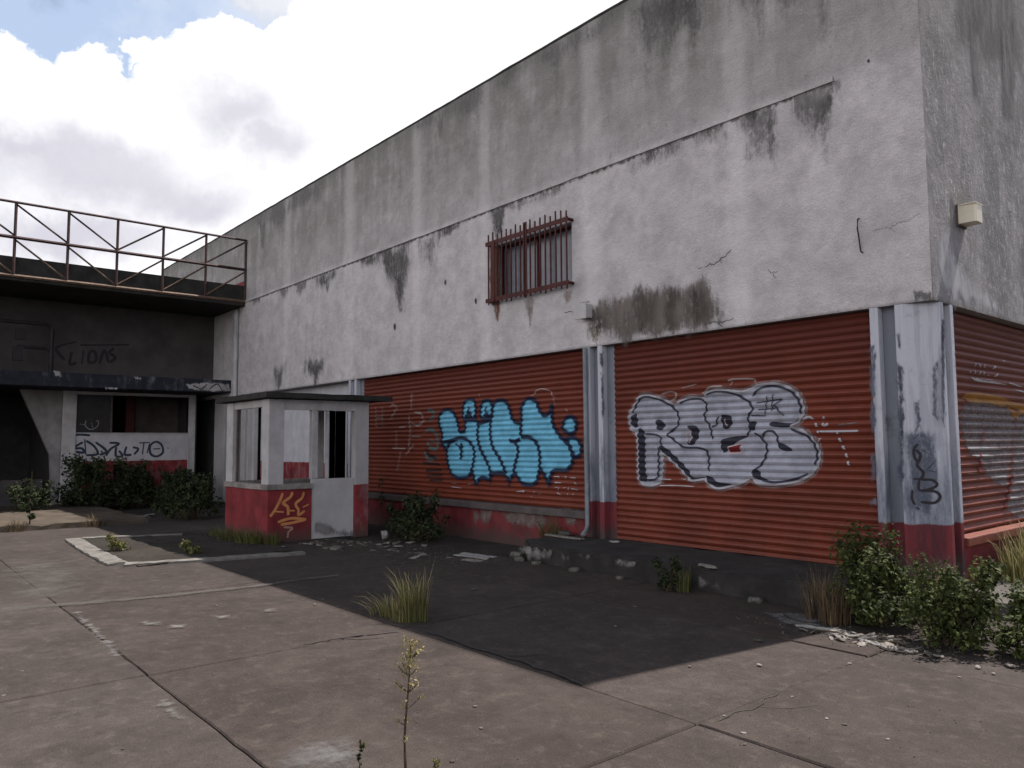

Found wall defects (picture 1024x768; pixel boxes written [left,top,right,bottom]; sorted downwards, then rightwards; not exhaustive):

leakage [250,81,836,310]
leakage [589,278,719,344]
leakage [308,359,323,385]
peeling [933,320,945,426]
peeling [897,366,937,510]